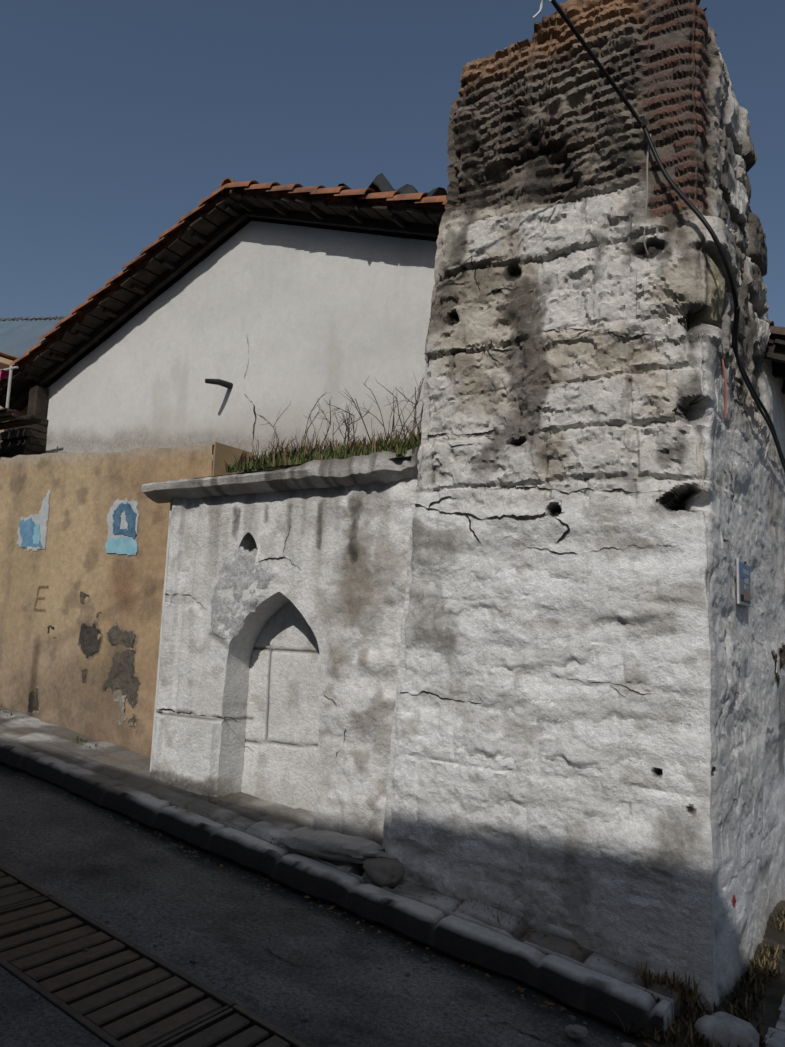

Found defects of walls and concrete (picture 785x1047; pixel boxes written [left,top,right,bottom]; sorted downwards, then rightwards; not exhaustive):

crack [415,486,677,554]
spalling [77,612,141,733]
spalling [771,643,785,688]